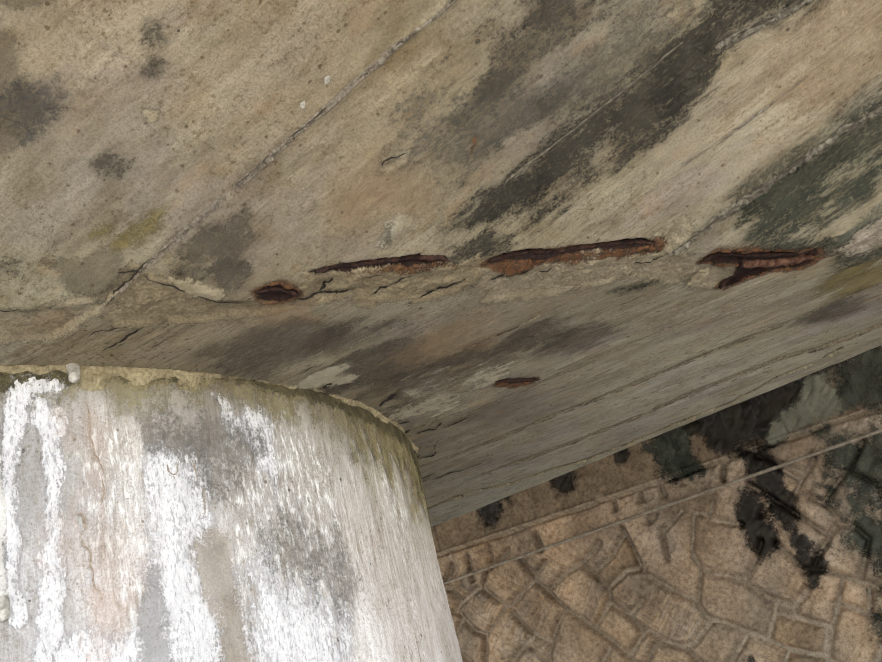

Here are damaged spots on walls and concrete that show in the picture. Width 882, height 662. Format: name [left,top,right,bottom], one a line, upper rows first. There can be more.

leakage [0,76,68,145]
leakage [379,0,826,268]
leakage [728,81,882,225]
crack [88,326,144,350]
crack [105,258,248,307]
spalling [0,214,882,345]